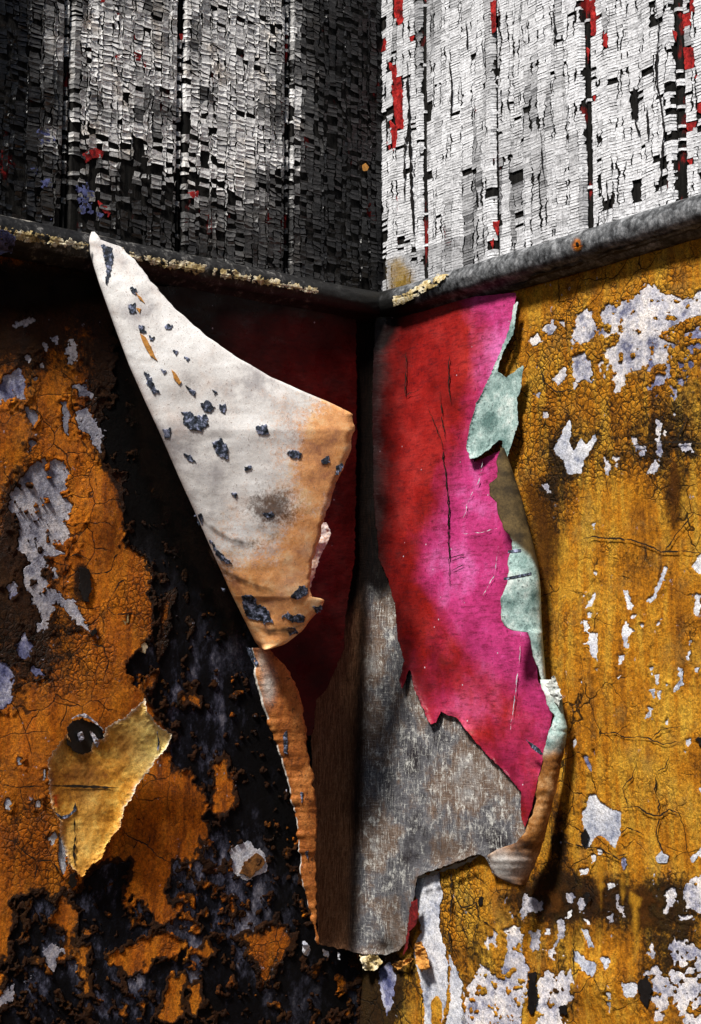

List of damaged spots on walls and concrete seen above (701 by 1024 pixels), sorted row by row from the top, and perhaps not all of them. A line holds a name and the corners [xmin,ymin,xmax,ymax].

peeling [394,0,414,53]
peeling [586,0,608,61]
peeling [672,0,698,78]
peeling [387,63,406,153]
peeling [0,226,319,294]
peeling [528,283,701,476]
crack [584,511,700,562]
flaking render [0,274,610,1024]
crack [561,720,686,864]
peeling [607,883,626,937]
flaking render [653,850,701,921]
flaking render [606,936,701,1024]